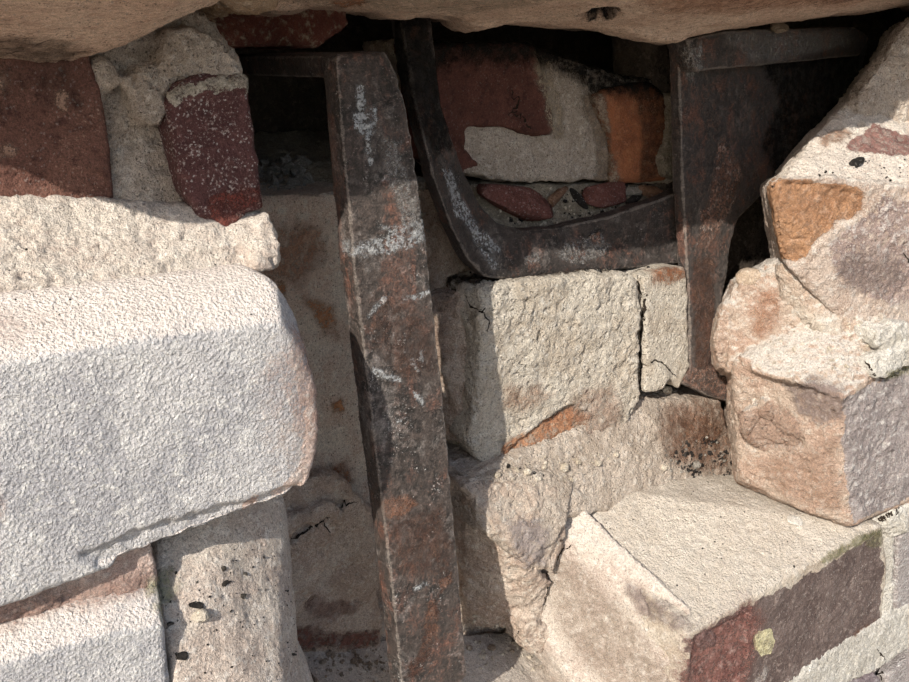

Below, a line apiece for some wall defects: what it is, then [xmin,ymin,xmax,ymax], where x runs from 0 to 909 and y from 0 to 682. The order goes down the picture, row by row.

crack [637,275,676,392]
corrosion [651,137,743,470]
crack [291,500,358,539]